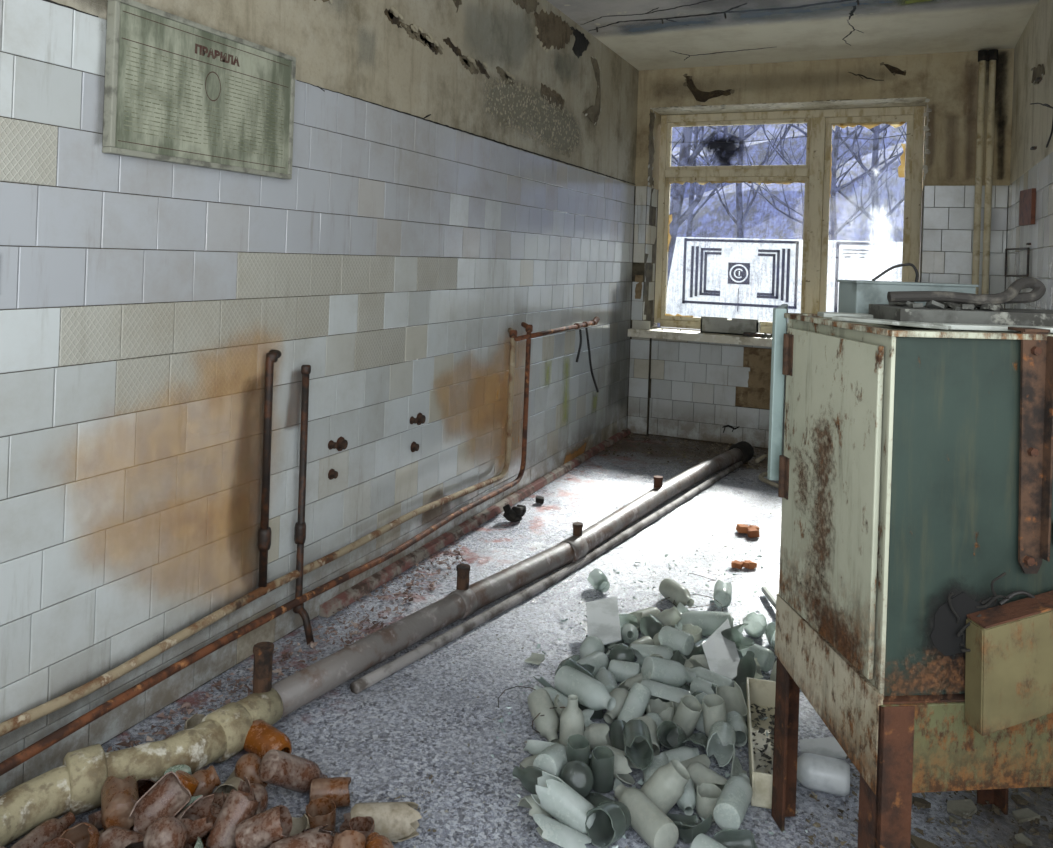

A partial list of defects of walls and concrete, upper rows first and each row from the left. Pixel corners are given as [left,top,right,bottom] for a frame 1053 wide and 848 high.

spalling [384,7,515,86]
peeling [513,0,601,125]
crack [581,0,863,46]
crack [673,47,773,60]
peeling [647,74,735,188]
leakage [987,52,1007,179]
peeling [725,345,772,409]